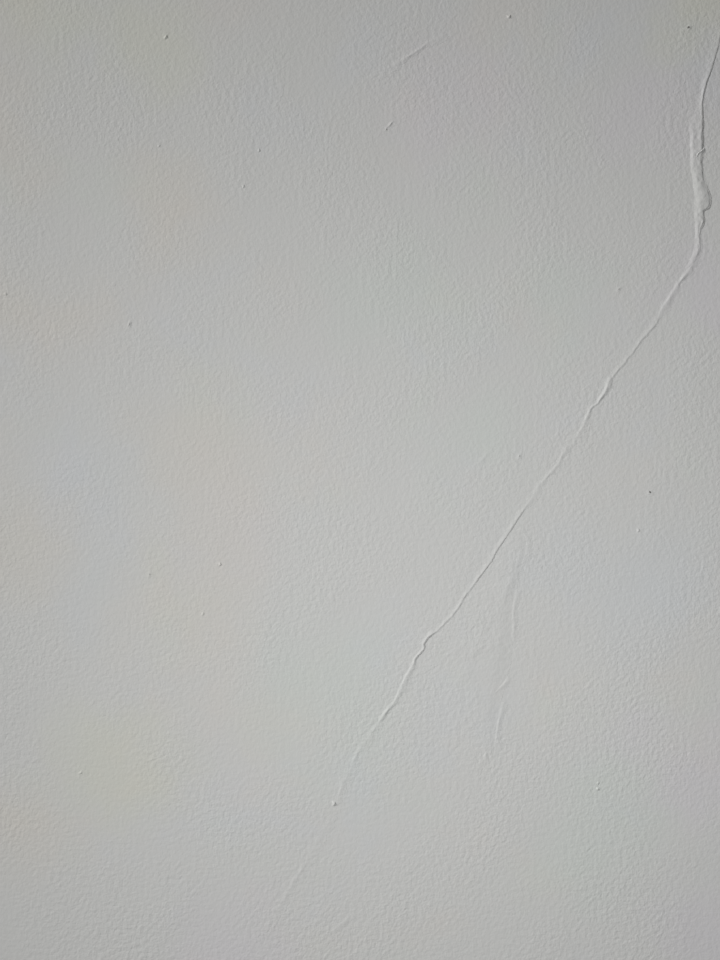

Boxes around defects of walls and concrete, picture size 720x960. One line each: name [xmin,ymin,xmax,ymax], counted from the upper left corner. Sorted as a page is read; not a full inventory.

crack [259,19,720,937]